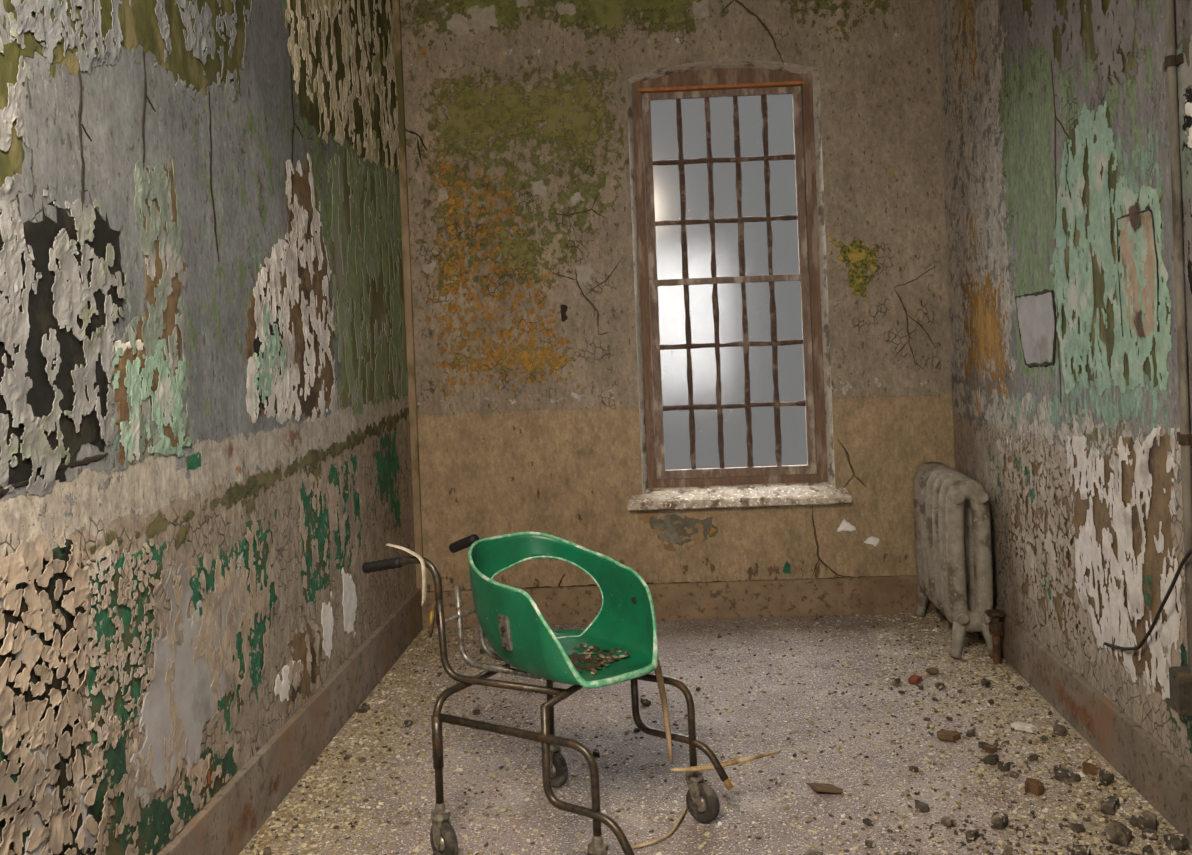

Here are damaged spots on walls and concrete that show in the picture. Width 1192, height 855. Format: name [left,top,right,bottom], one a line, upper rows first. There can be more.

damp [446,0,528,31]
damp [553,0,702,32]
crack [78,63,92,211]
peeling [0,0,252,497]
crack [142,52,156,170]
crack [209,92,220,262]
peeling [245,0,409,424]
damp [423,58,615,294]
damp [830,235,881,296]
peeling [0,454,364,855]
crack [812,505,871,578]
peeling [996,427,1192,754]